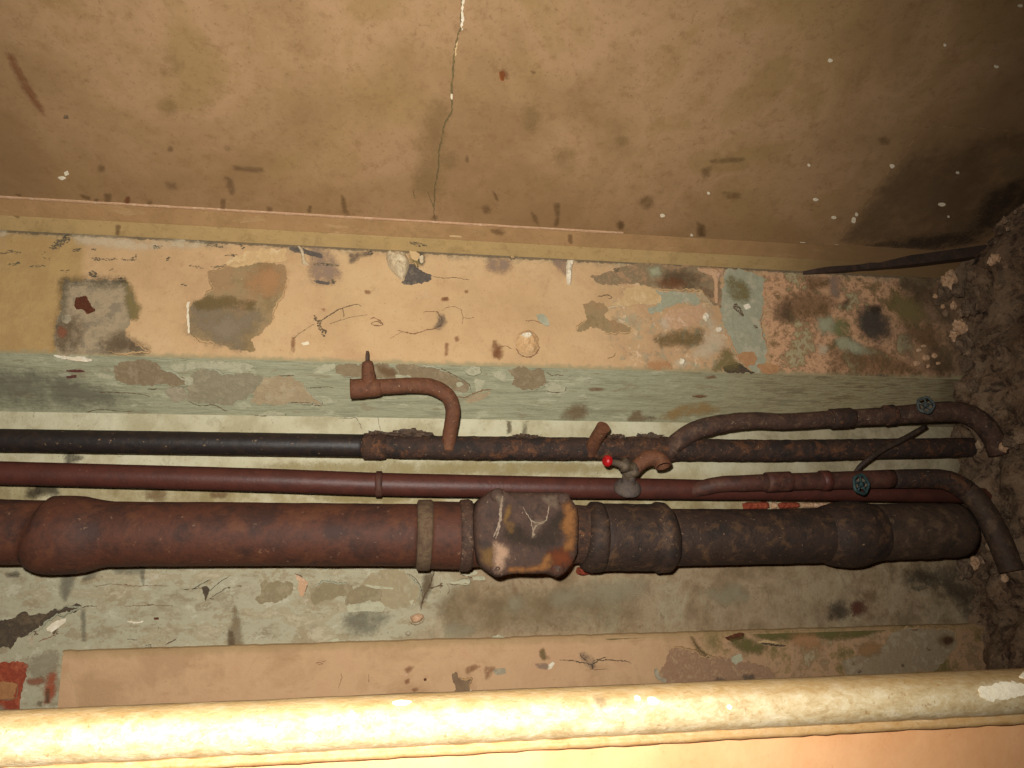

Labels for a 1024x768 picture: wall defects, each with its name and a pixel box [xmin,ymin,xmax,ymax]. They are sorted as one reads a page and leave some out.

crack [413,0,465,219]
peeling [53,246,566,417]
peeling [576,262,779,374]
water stain [776,277,948,377]
flaking render [0,603,97,710]
peeling [654,638,775,683]
flaking render [841,625,957,675]